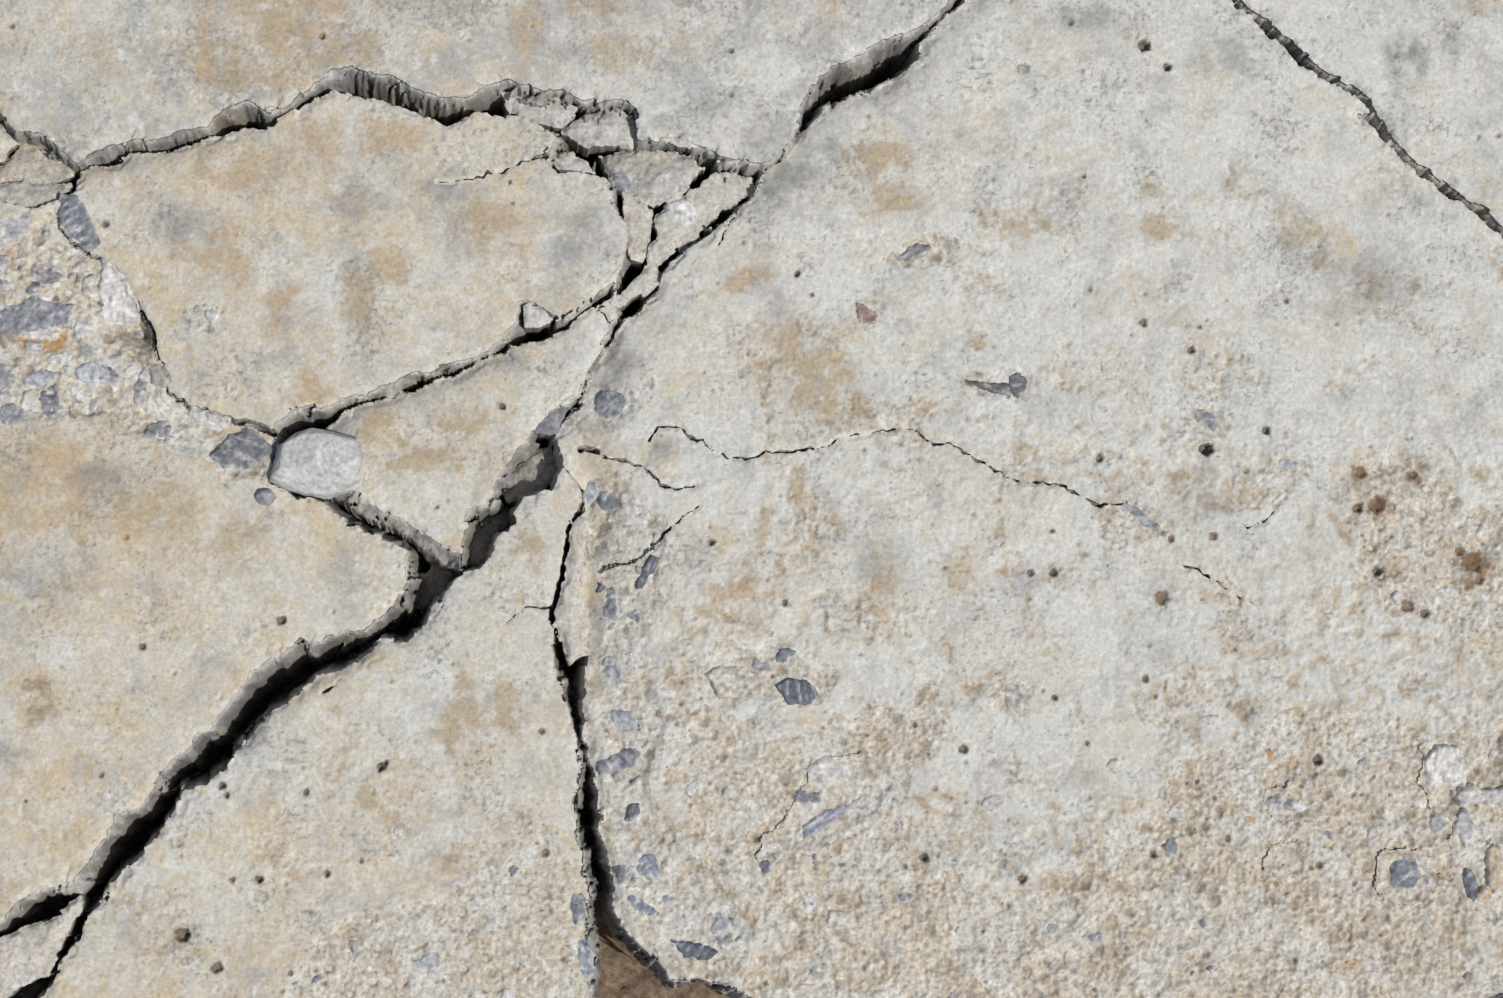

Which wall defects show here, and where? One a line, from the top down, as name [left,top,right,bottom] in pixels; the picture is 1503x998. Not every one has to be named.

crack [1232,0,1503,238]
spalling [0,193,276,489]
crack [0,0,1122,998]
crack [1487,990,1503,998]